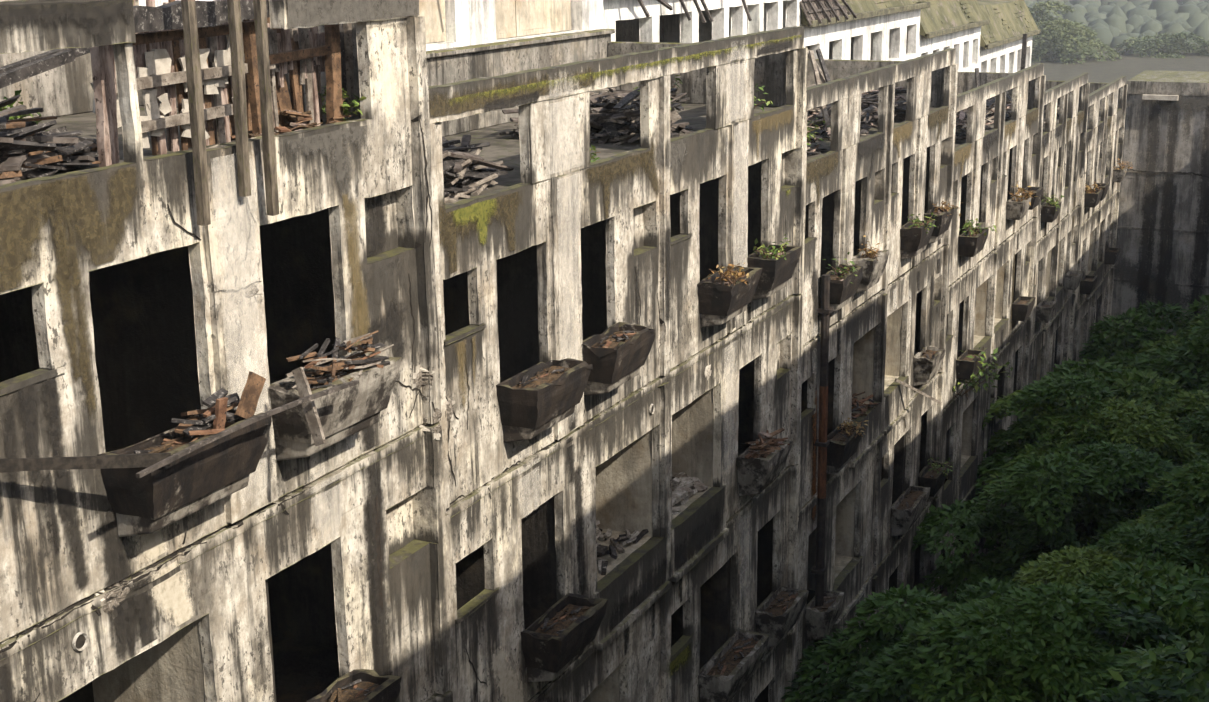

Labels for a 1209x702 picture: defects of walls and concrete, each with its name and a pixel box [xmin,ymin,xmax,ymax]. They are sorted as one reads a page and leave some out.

leakage [429,68,596,118]
leakage [0,166,136,412]
leakage [438,191,522,274]
leakage [1092,95,1209,317]
leakage [0,377,89,589]
leakage [567,405,586,595]
rust [811,385,828,521]
leakage [101,509,157,663]
leakage [0,651,25,702]